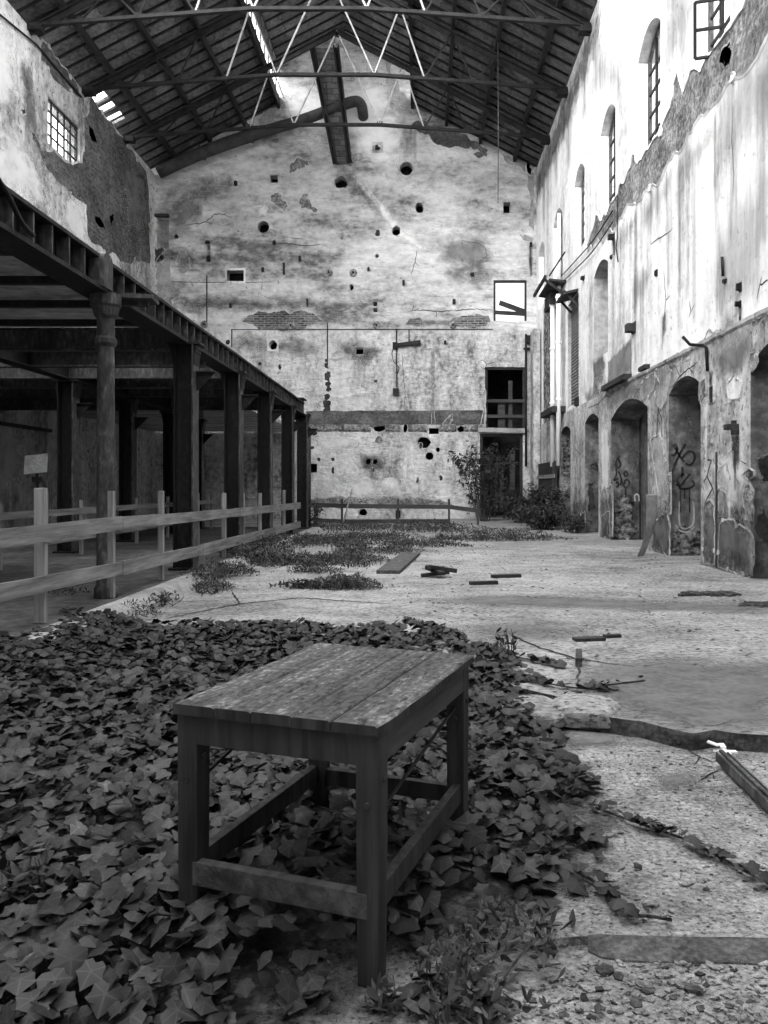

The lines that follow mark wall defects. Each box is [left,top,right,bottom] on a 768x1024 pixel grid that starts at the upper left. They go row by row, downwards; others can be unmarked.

flaking render [20,39,191,306]
flaking render [240,309,325,370]
spalling [254,157,318,245]
flaking render [384,62,536,244]
water stain [445,240,488,281]
flaking render [446,312,491,329]
flaking render [586,0,768,252]
flaking render [650,421,768,577]